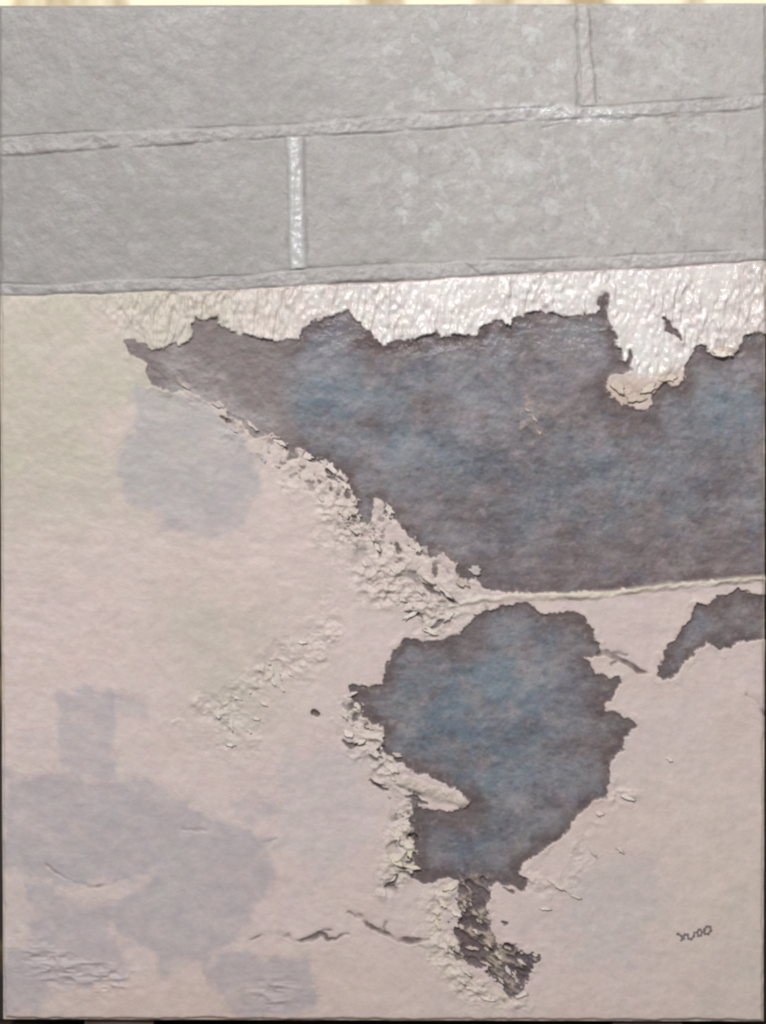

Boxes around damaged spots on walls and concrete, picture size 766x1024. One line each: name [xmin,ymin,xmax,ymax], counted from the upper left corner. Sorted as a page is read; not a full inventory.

crack [247,908,432,946]
spalling [82,262,766,1021]